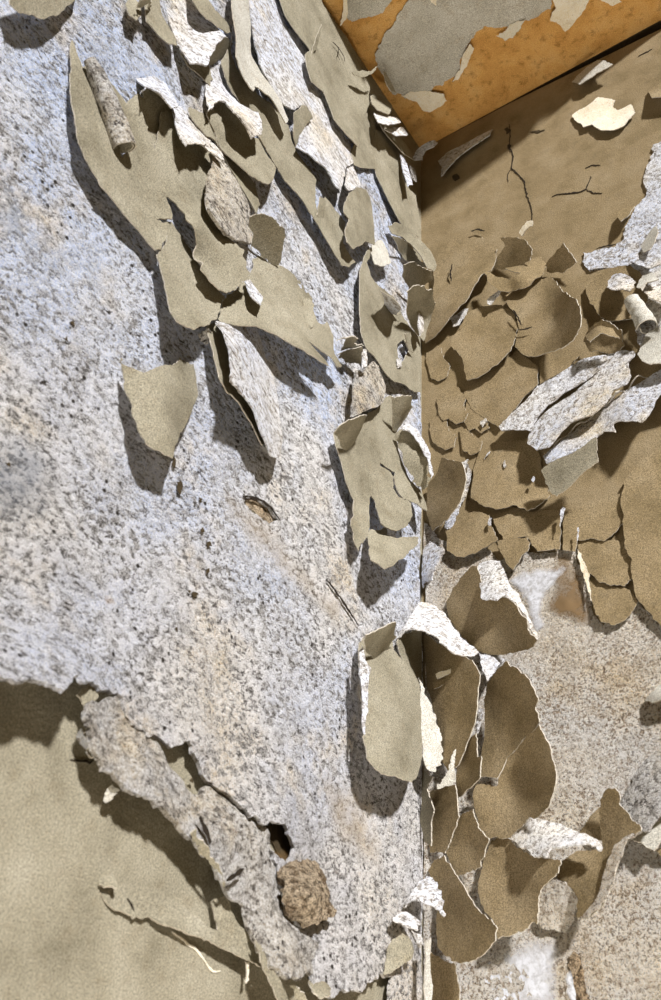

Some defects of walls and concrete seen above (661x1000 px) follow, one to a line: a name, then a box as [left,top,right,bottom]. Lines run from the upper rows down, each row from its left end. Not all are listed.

peeling [166,0,582,381]
crack [507,124,602,221]
peeling [572,60,613,85]
peeling [572,97,635,131]
peeling [648,75,661,99]
flaking render [0,0,450,1000]
flaking render [396,142,661,939]
flaking render [423,839,661,1000]